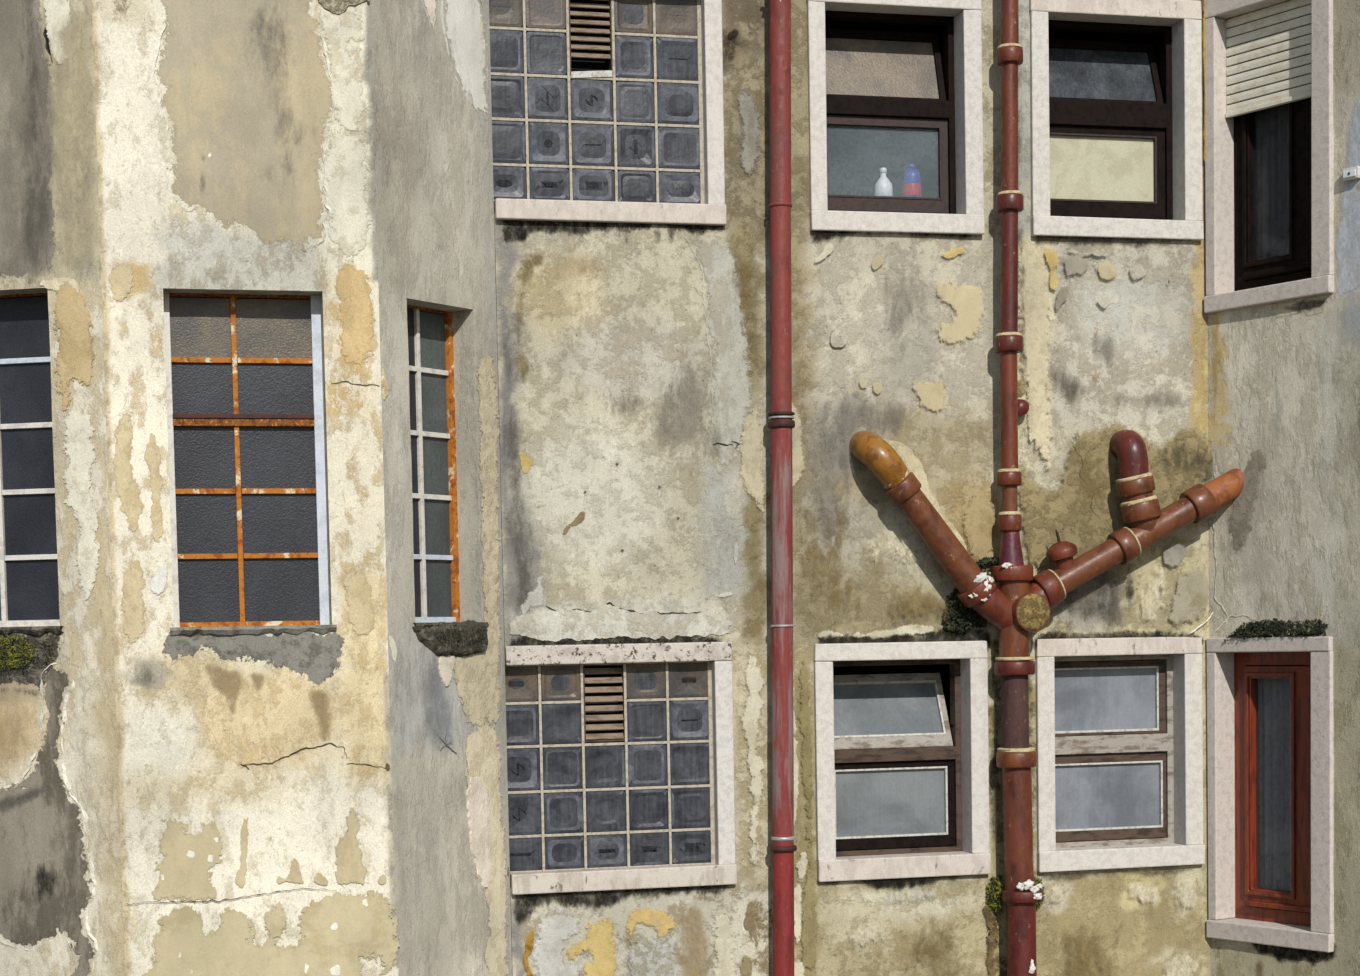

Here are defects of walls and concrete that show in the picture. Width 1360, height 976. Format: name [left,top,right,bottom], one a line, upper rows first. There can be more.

peeling [421,0,490,120]
peeling [0,0,56,278]
peeling [151,0,336,252]
peeling [936,280,985,343]
leakage [804,403,901,607]
leakage [868,537,915,561]
leakage [820,591,991,651]
leakage [1035,569,1204,647]
crack [241,743,386,769]
spalling [0,663,99,976]
peeling [142,806,401,976]
peeling [566,908,679,976]